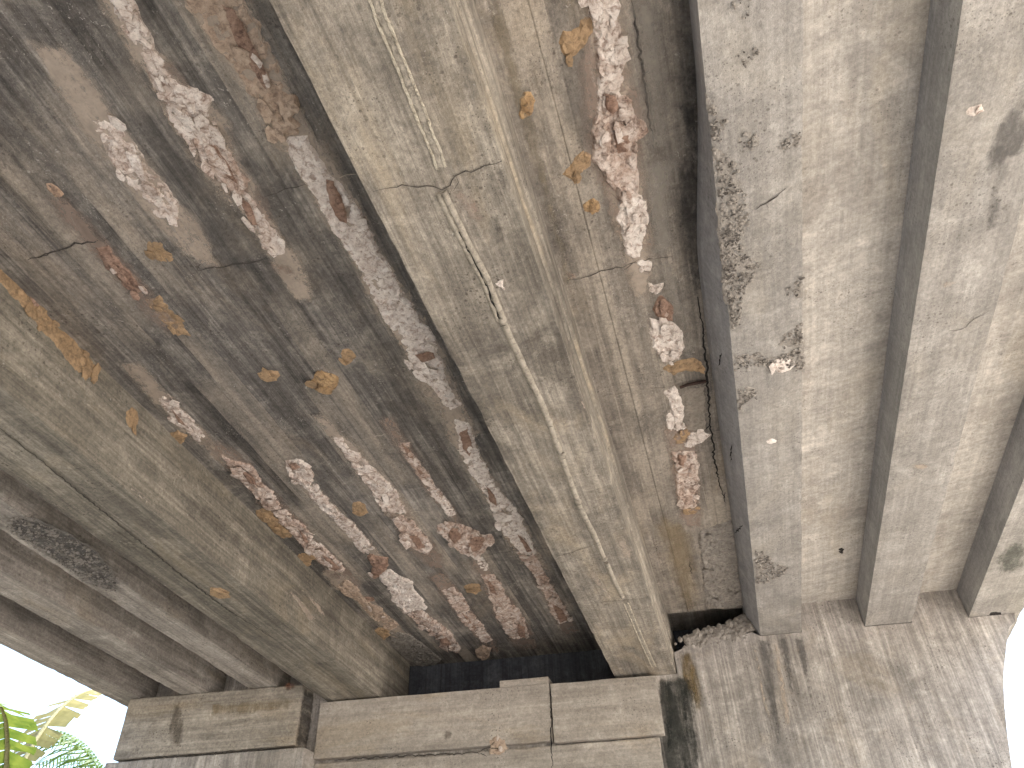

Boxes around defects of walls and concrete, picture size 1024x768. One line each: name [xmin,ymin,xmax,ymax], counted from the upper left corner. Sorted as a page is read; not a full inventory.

crack [28,235,113,260]
spalling [31,43,219,266]
spalling [101,0,579,667]
crack [338,161,502,192]
crack [572,256,673,280]
spalling [559,0,743,608]
crack [697,297,732,503]
damp [13,521,110,588]